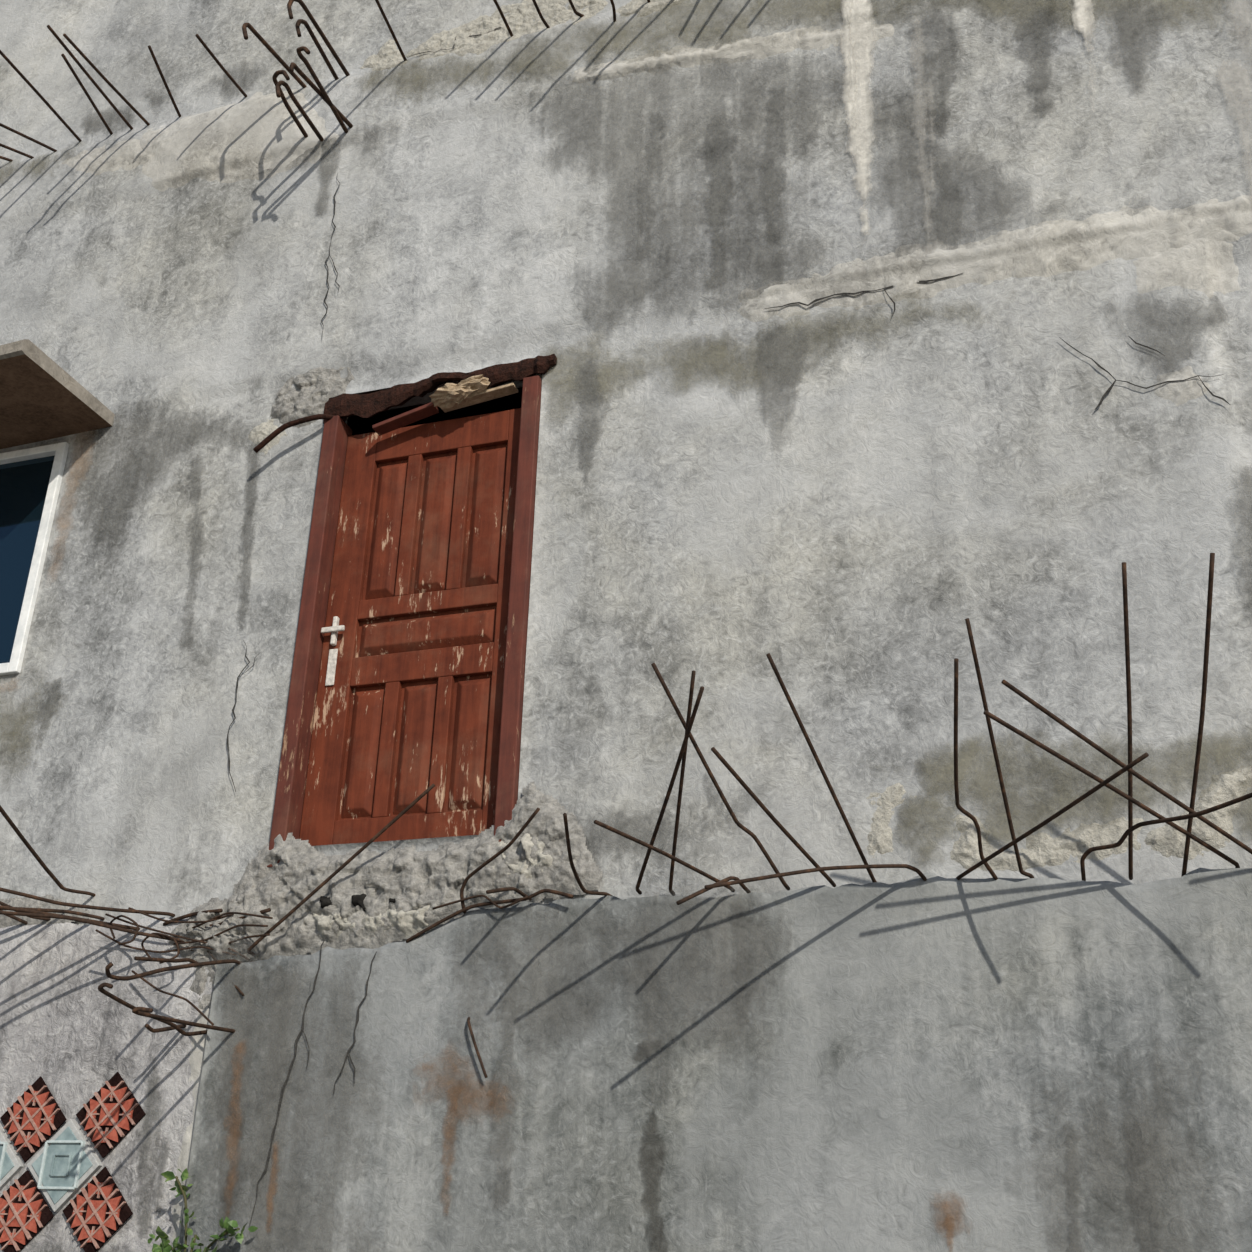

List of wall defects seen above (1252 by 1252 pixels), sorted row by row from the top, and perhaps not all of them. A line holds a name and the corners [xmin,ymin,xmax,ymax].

leakage [542,0,1220,328]
crack [321,173,340,334]
crack [765,273,963,317]
spalling [248,366,355,455]
leakage [666,317,883,427]
crack [1059,337,1229,409]
spalling [0,653,927,1036]
crack [249,936,327,1227]
crack [333,951,377,1094]
leakage [490,890,782,1204]
leakage [641,1114,667,1252]